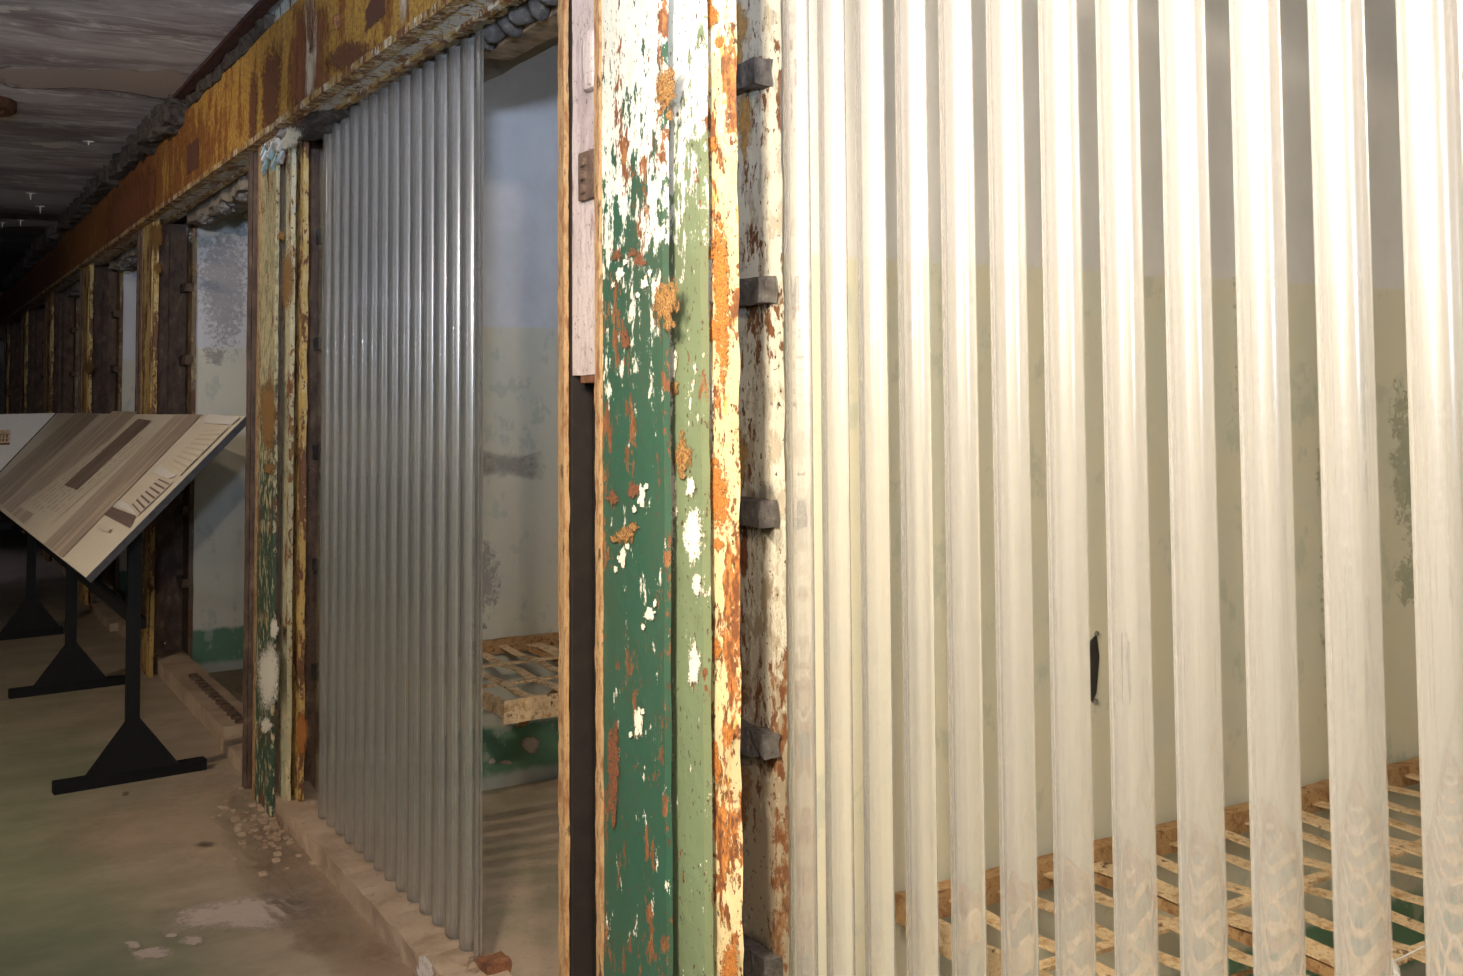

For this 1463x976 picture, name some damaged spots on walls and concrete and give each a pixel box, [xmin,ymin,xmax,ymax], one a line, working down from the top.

corrosion [247,0,386,151]
corrosion [707,0,748,64]
peeling [611,259,671,298]
corrosion [708,200,731,411]
peeling [614,544,629,572]
peeling [632,483,648,513]
corrosion [672,430,692,479]
peeling [669,308,711,595]
corrosion [710,431,748,577]
water stain [1390,380,1414,605]
peeling [256,618,280,733]
peeling [688,638,701,686]